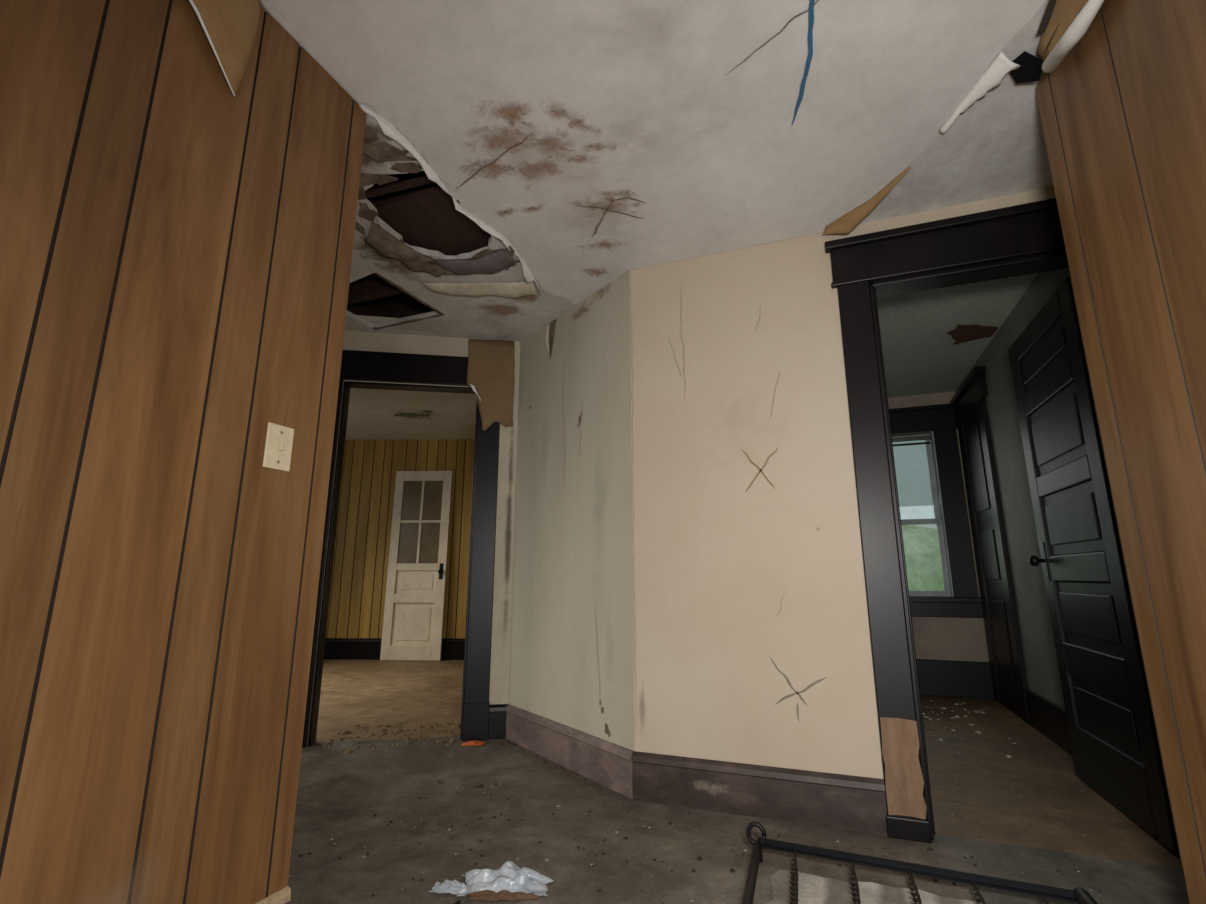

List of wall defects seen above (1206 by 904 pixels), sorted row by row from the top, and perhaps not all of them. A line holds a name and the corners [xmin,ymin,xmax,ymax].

damp [472,106,523,176]
peeling [355,139,422,248]
damp [480,295,536,315]